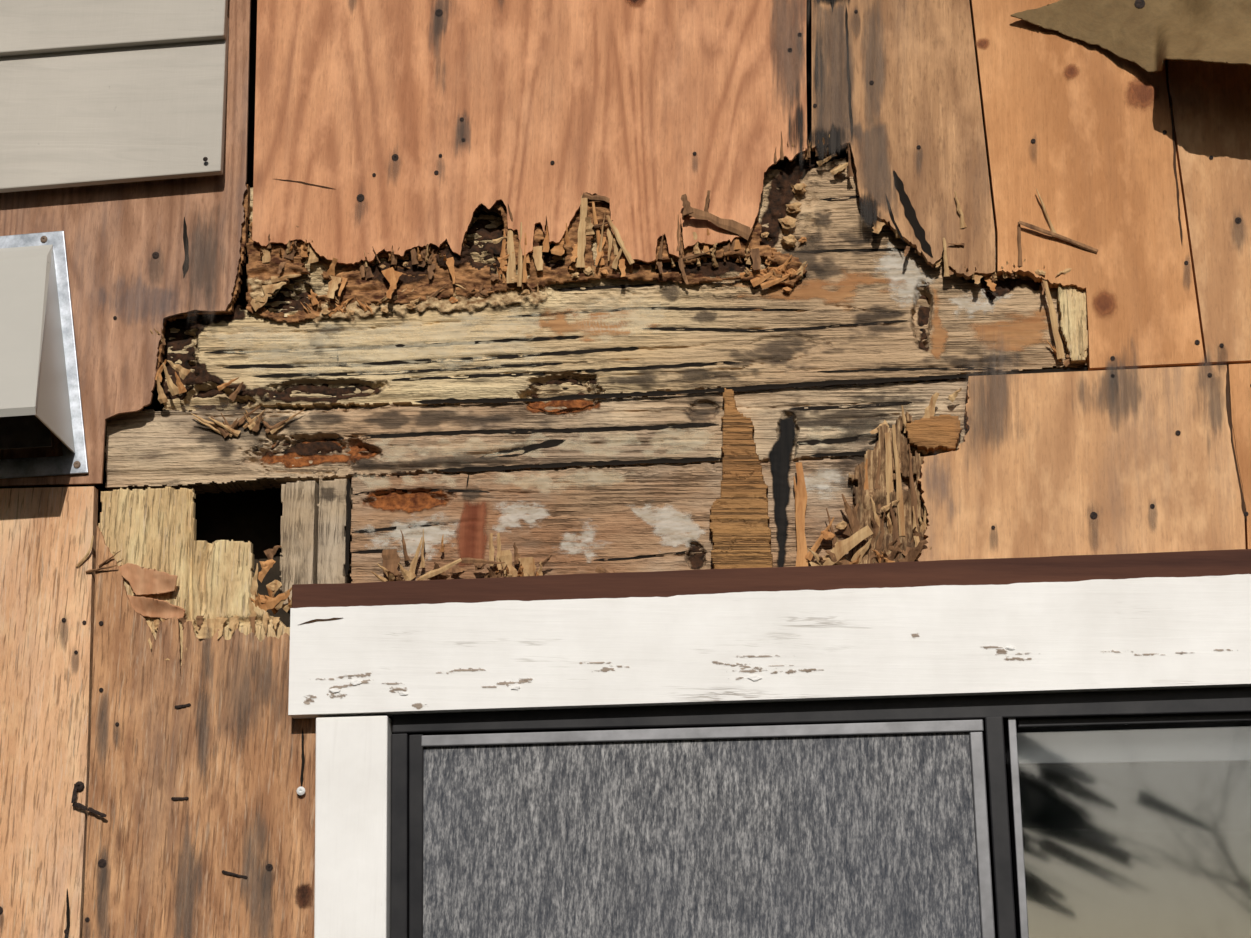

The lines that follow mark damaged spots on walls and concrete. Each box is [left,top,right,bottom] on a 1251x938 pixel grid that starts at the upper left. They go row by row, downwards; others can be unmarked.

peeling [261,226,455,299]
peeling [517,217,761,284]
peeling [762,273,888,304]
peeling [872,220,910,256]
peeling [974,259,1026,291]
peeling [537,309,630,341]
peeling [974,281,1048,351]
peeling [304,673,422,709]
peeling [482,678,532,690]
peeling [712,655,816,681]
peeling [984,645,1032,661]
damp [99,702,107,752]